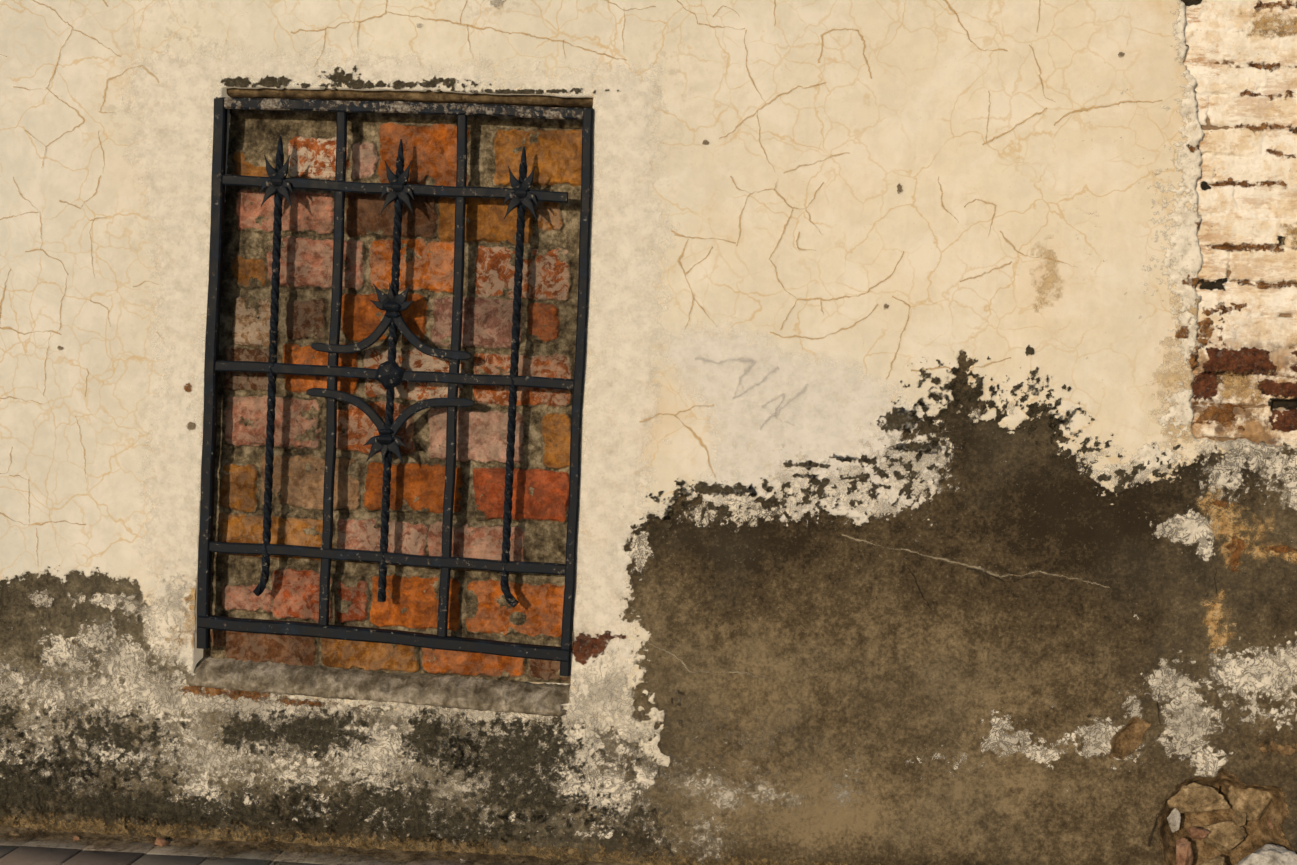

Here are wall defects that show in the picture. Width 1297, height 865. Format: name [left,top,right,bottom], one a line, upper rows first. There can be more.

crack [945,0,1162,145]
crack [0,0,159,404]
crack [291,0,951,379]
flaking render [662,0,1297,566]
crack [938,178,1064,282]
crack [0,450,86,560]
peeling [0,568,801,863]
peeling [629,527,653,580]
damp [0,350,1297,865]
crack [639,404,715,475]
crack [842,534,1110,609]
spalling [908,632,1297,865]